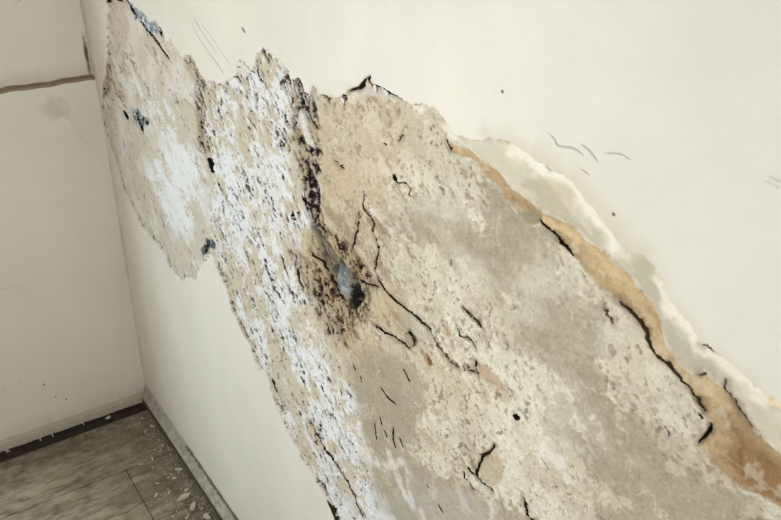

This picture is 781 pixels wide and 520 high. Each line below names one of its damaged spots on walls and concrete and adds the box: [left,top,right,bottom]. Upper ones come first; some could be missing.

peeling [101,0,421,520]
crack [281,256,304,287]
crack [302,196,346,301]
crack [352,194,482,375]
peeling [309,81,781,520]
crack [374,387,404,448]
crack [462,444,495,492]
crack [523,498,534,520]